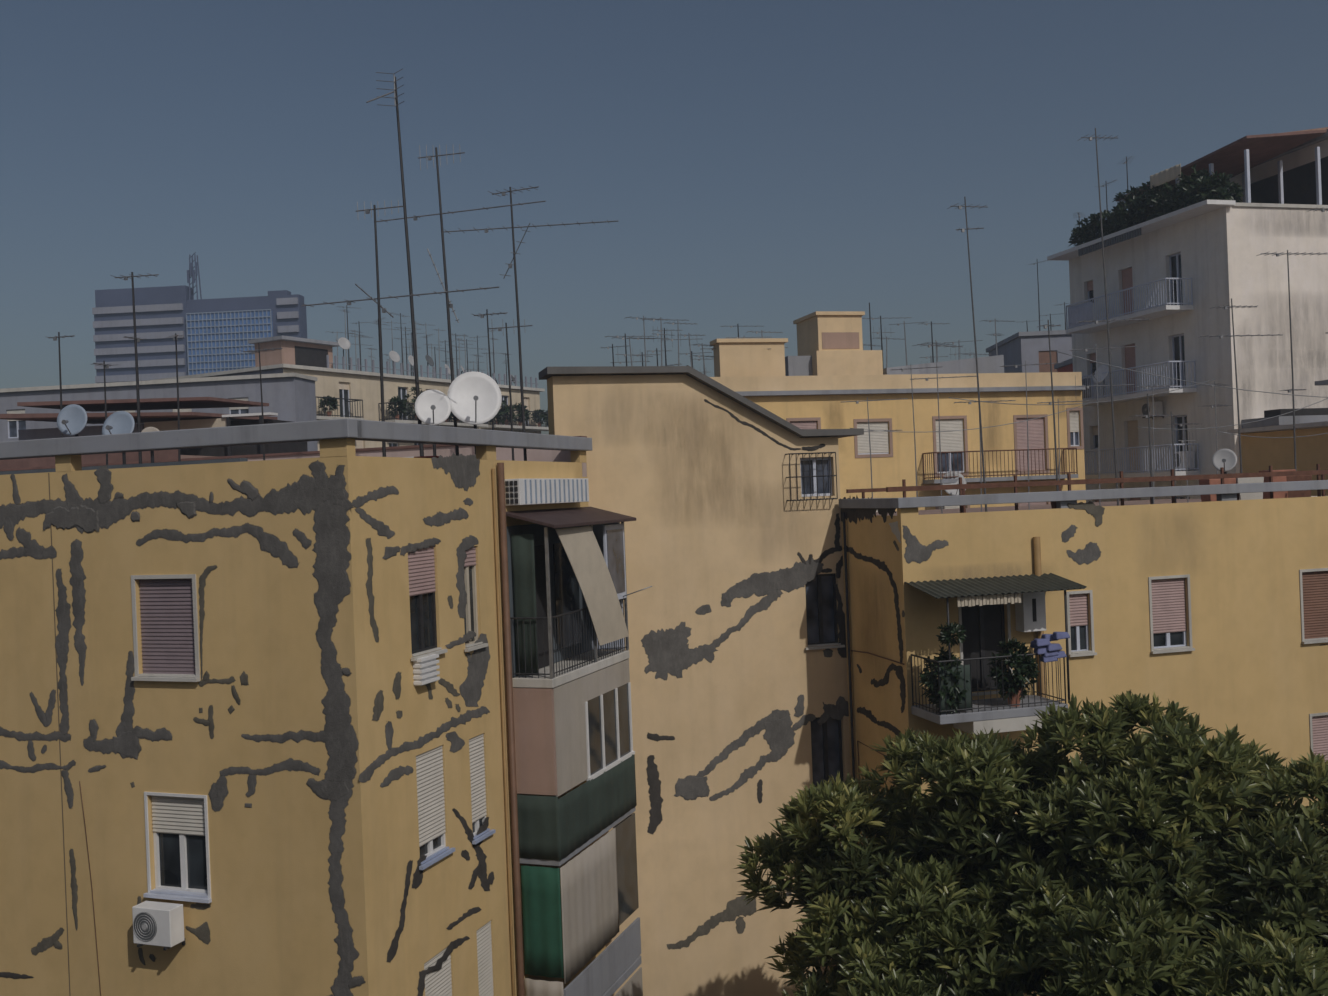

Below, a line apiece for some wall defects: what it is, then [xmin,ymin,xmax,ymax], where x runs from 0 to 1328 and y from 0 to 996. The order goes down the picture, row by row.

crack [704,399,825,451]